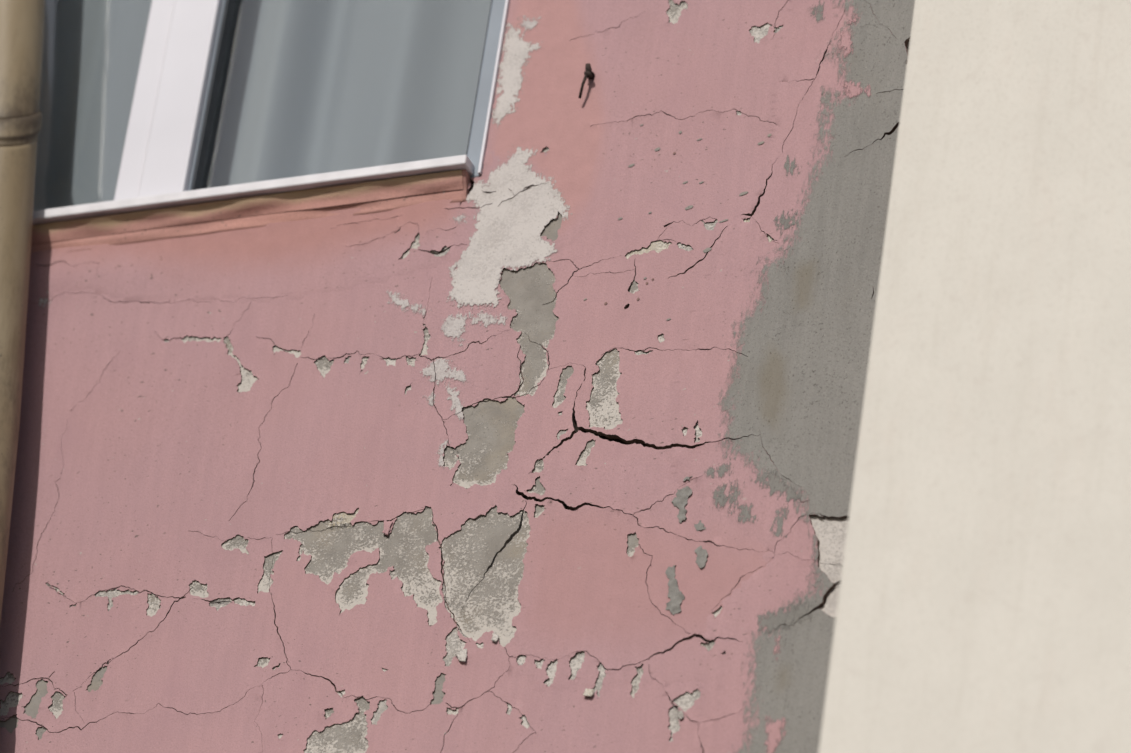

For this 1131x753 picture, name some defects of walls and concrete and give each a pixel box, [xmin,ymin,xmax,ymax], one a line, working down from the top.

peeling [541,212,562,241]
peeling [273,345,301,358]
peeling [314,356,369,377]
peeling [383,324,431,367]
peeling [444,263,574,489]
peeling [576,318,671,466]
crack [575,419,658,450]
peeling [189,452,551,715]
spalling [810,516,848,617]
peeling [517,652,606,697]
peeling [0,679,65,740]
peeling [304,690,394,753]